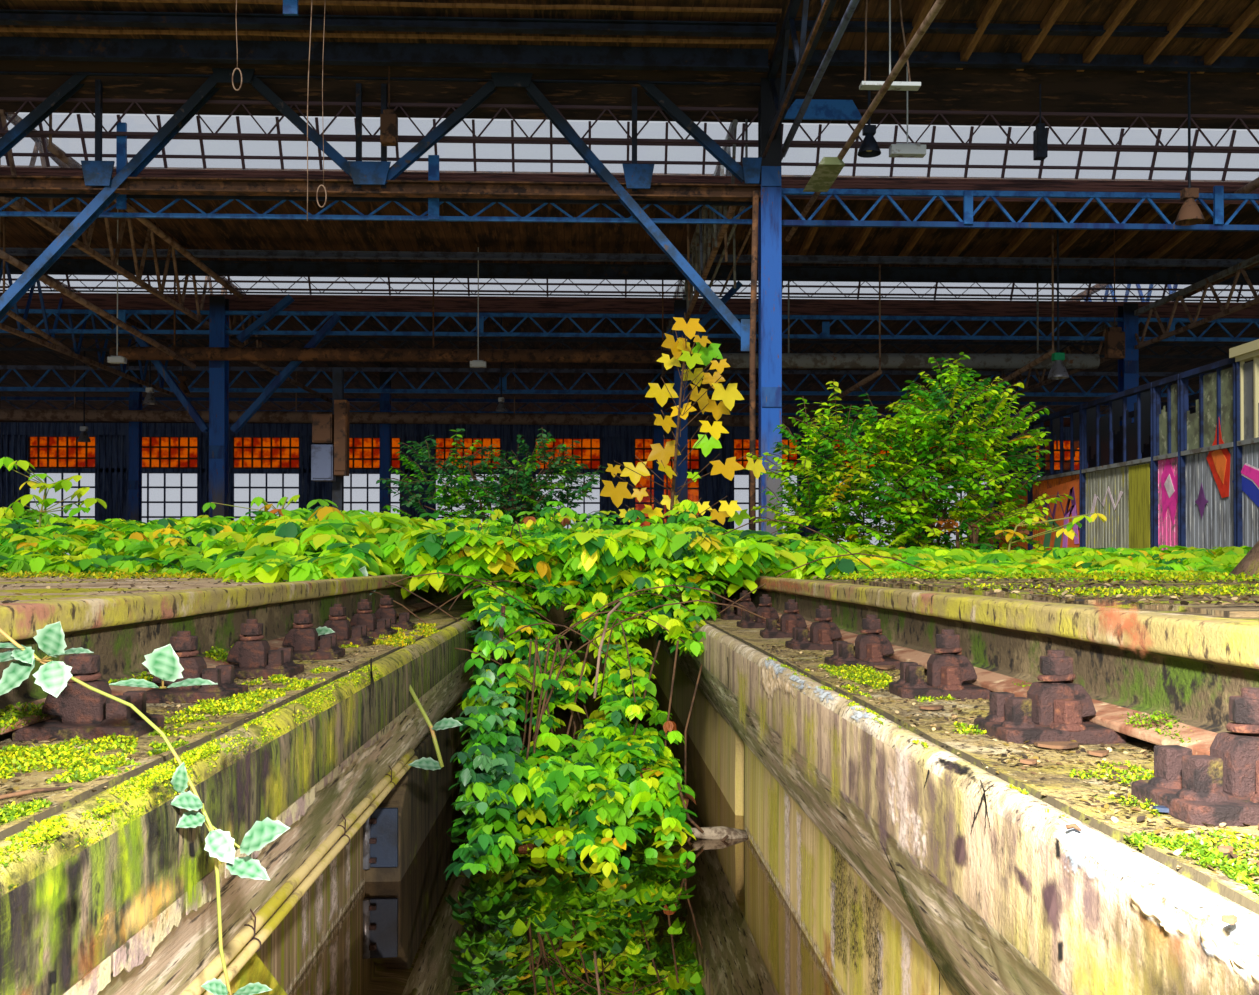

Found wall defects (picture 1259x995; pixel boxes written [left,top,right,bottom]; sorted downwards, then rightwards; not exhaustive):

crack [970,780,994,834]
water stain [0,840,86,991]
water stain [746,790,911,995]
water stain [1016,857,1068,929]
water stain [1083,873,1094,922]
water stain [1112,919,1259,995]